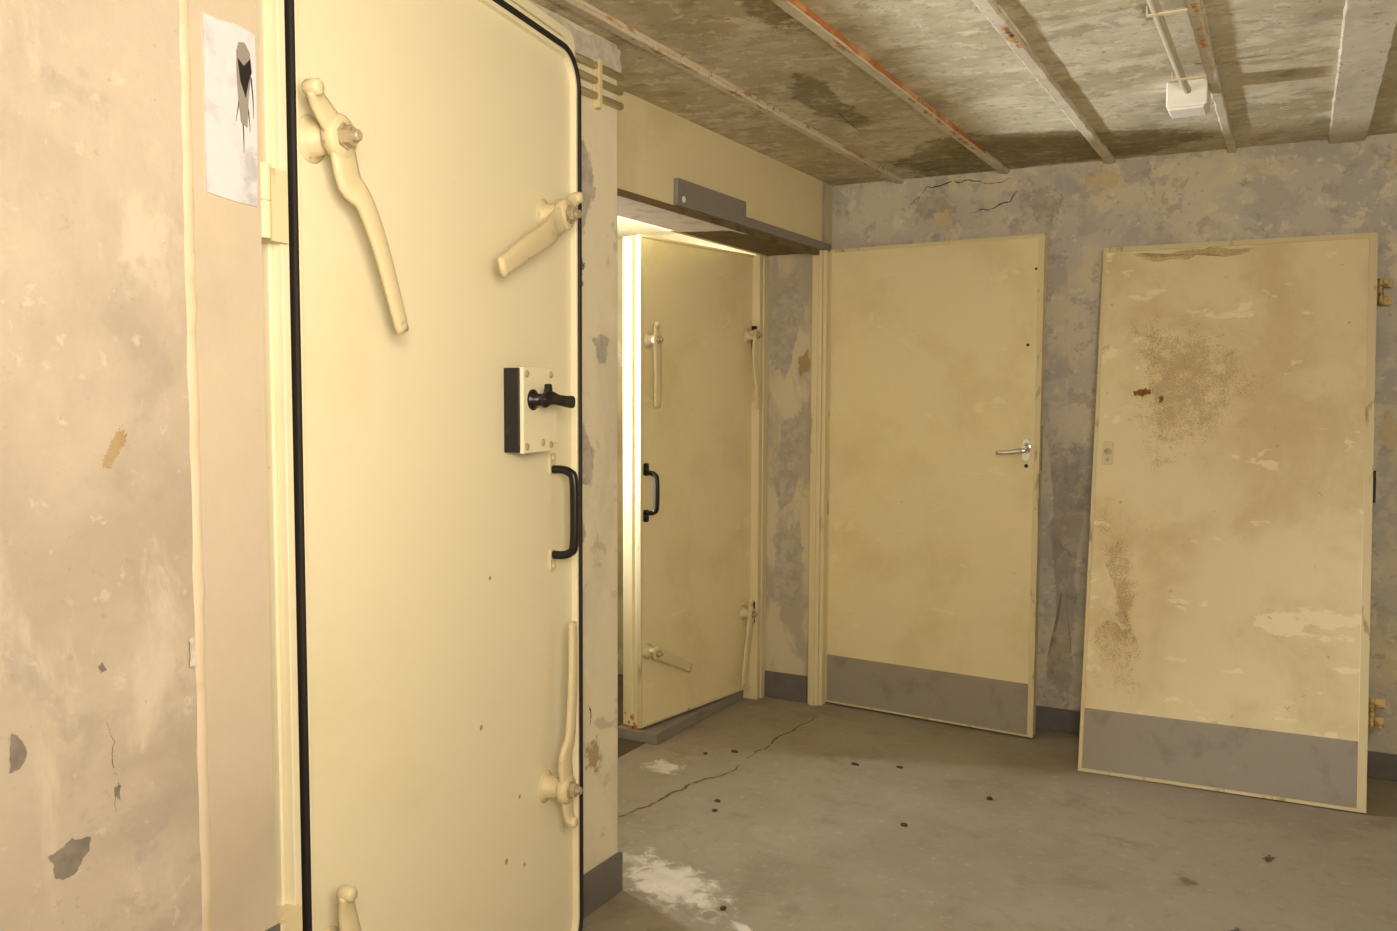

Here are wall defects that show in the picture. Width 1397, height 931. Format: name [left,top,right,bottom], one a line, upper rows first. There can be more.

corrosion [998,4,1030,49]
corrosion [575,0,888,173]
corrosion [789,0,986,153]
peeling [592,334,610,365]
crack [618,718,814,817]
spalling [48,836,91,880]